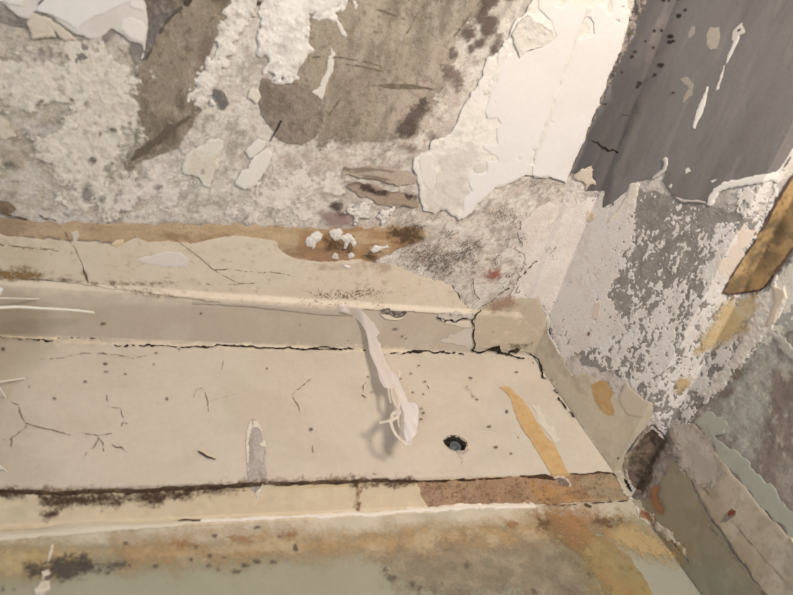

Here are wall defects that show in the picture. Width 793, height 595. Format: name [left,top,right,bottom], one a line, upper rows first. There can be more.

spalling [0,0,231,172]
spalling [235,0,488,189]
peeling [182,138,224,187]
damp [324,237,353,253]
damp [388,205,527,310]
spalling [341,0,793,497]
crack [0,335,366,370]
peeling [0,231,474,449]
crack [384,261,575,418]
crack [3,395,128,454]
peeling [0,484,536,531]
damp [0,513,695,595]